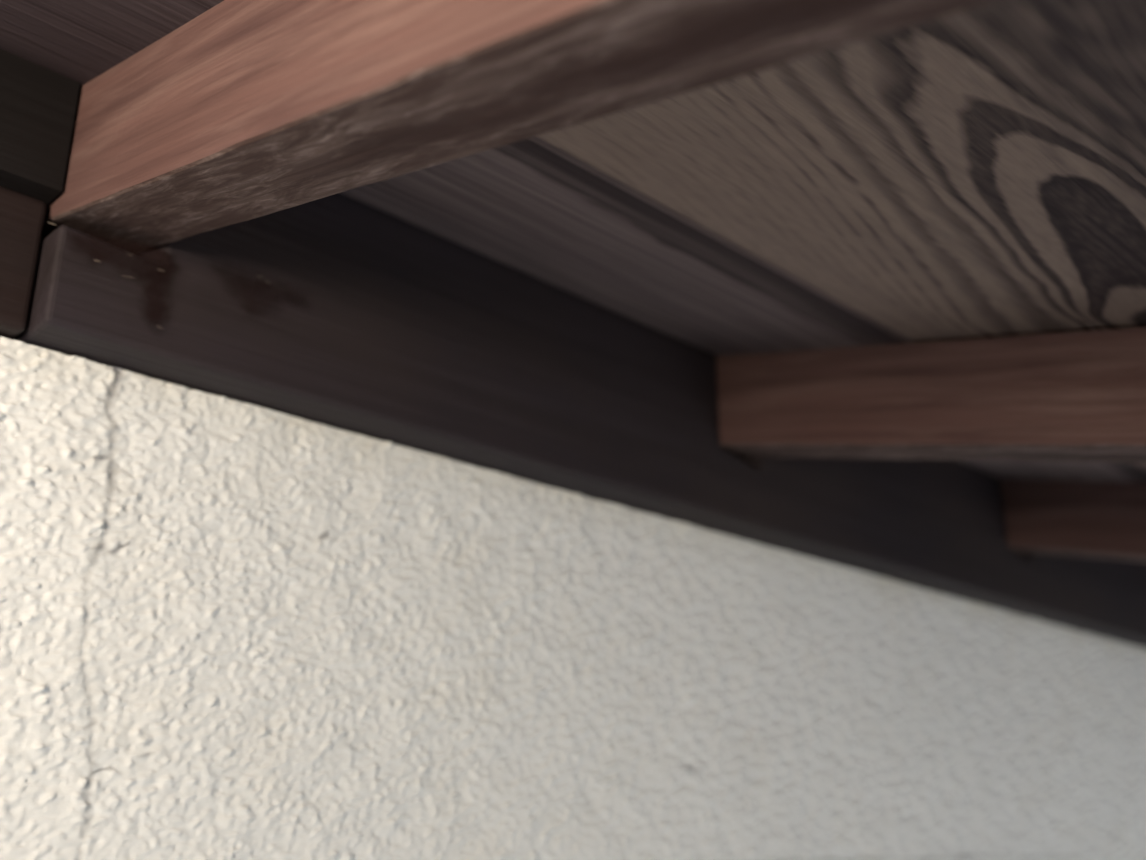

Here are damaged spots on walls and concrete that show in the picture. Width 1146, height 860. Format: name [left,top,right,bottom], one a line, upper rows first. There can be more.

crack [109,366,122,400]